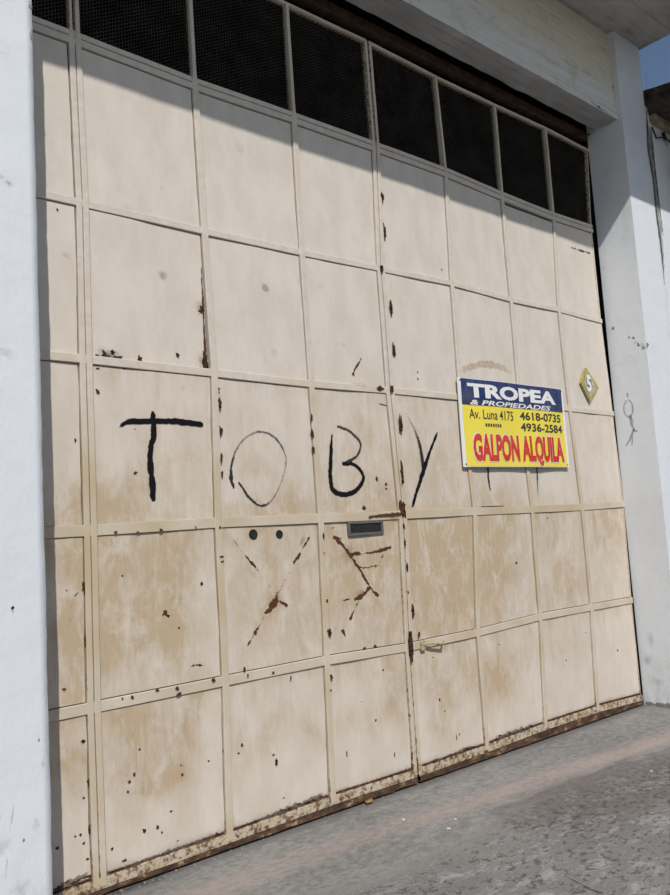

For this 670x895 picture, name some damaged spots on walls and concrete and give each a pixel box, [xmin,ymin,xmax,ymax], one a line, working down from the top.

rust [198,266,209,368]
rust [362,500,406,529]
rust [323,528,391,620]
rust [247,580,288,646]
rust [494,725,533,740]
rust [426,733,475,765]
rust [253,794,323,823]
rust [122,832,219,868]
rust [53,874,92,890]